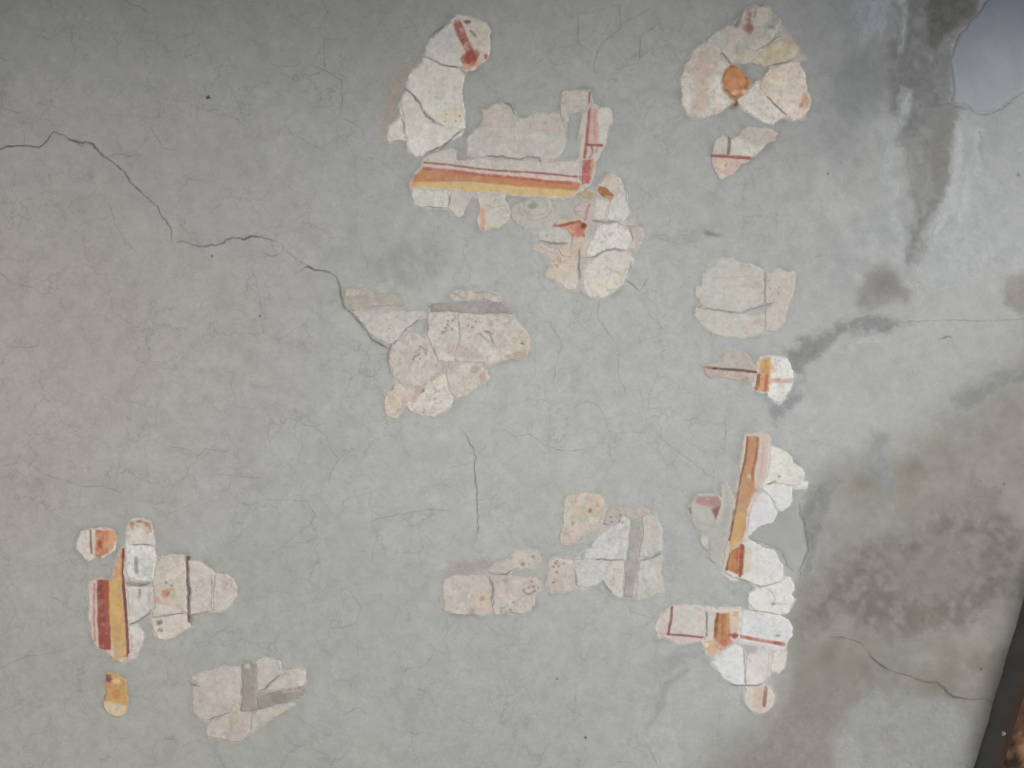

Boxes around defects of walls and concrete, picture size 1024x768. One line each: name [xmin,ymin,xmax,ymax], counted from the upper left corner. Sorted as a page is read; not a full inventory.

crack [0,131,273,256]
water stain [788,0,1024,373]
crack [302,266,395,349]
water stain [771,389,801,421]
water stain [798,469,1024,646]
crack [839,637,993,705]